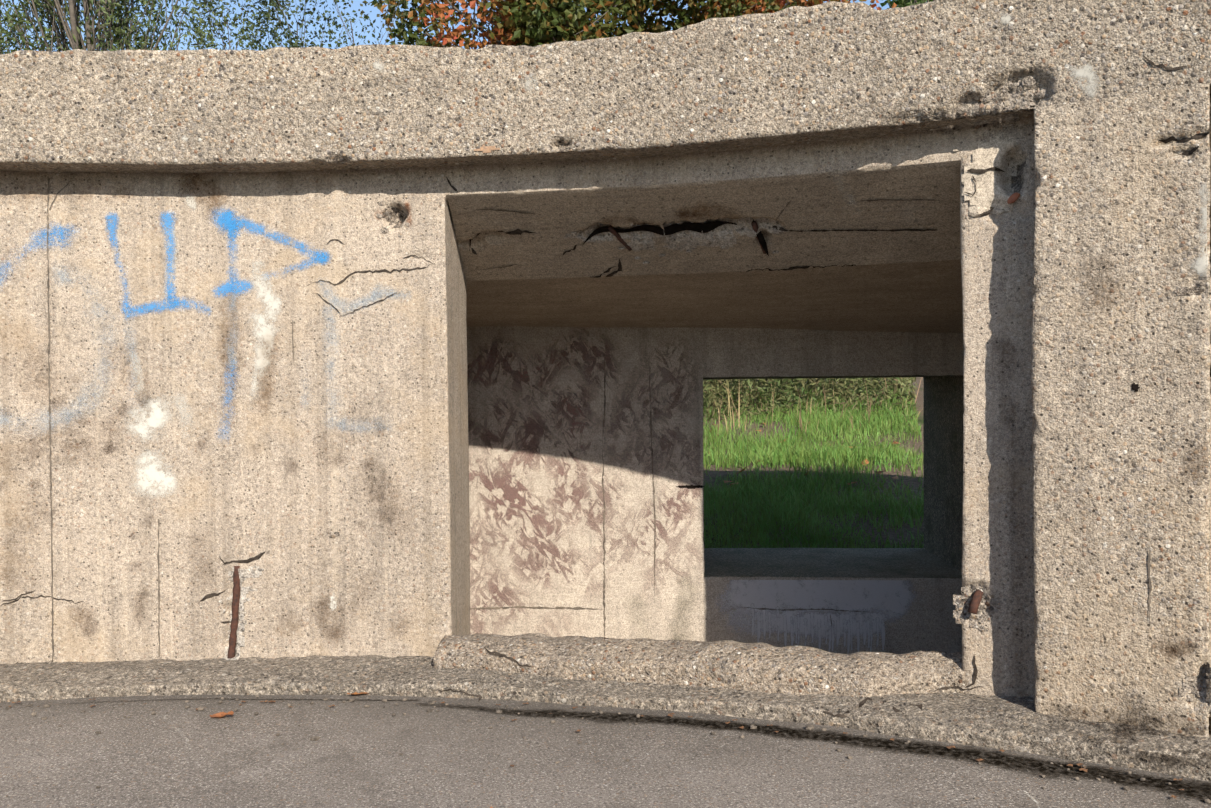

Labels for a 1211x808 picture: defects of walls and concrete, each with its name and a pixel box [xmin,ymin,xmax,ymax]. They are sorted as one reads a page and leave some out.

flaking render [921,71,1058,217]
crack [446,177,536,271]
crack [563,167,1005,278]
crack [307,255,435,316]